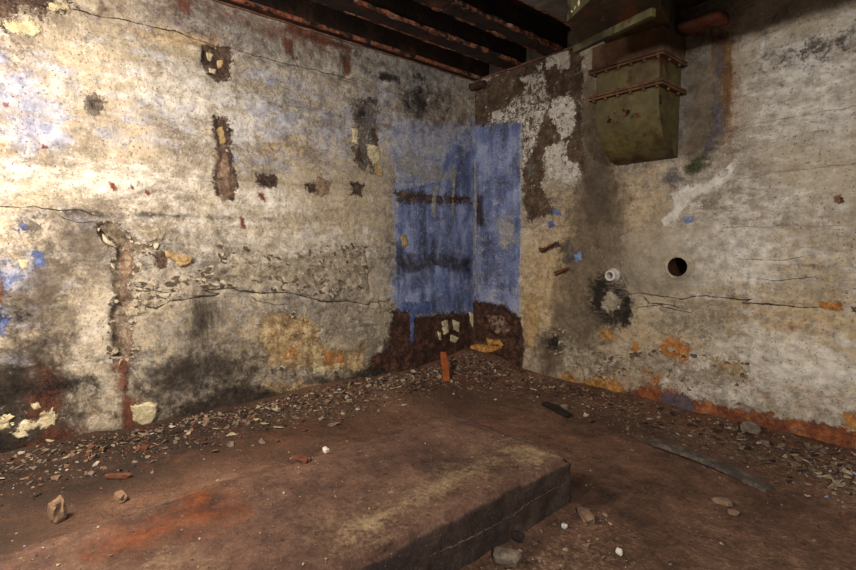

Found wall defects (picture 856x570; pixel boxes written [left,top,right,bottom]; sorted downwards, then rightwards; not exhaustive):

rust [231,0,522,80]
rust [418,0,565,56]
spalling [209,113,239,201]
peeling [475,50,588,228]
crack [1,206,99,223]
water stain [520,83,624,375]
spalling [94,219,368,396]
crack [136,248,391,309]
peeling [0,402,60,442]
water stain [0,339,99,416]
water stain [143,350,278,418]
rust [562,365,856,449]